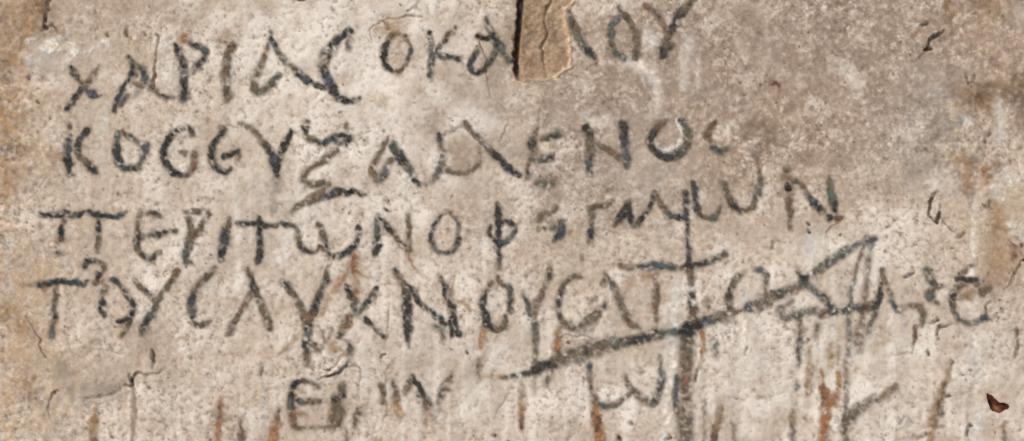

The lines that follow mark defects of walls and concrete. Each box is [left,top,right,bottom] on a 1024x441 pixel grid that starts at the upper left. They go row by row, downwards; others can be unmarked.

spalling [510,0,575,82]